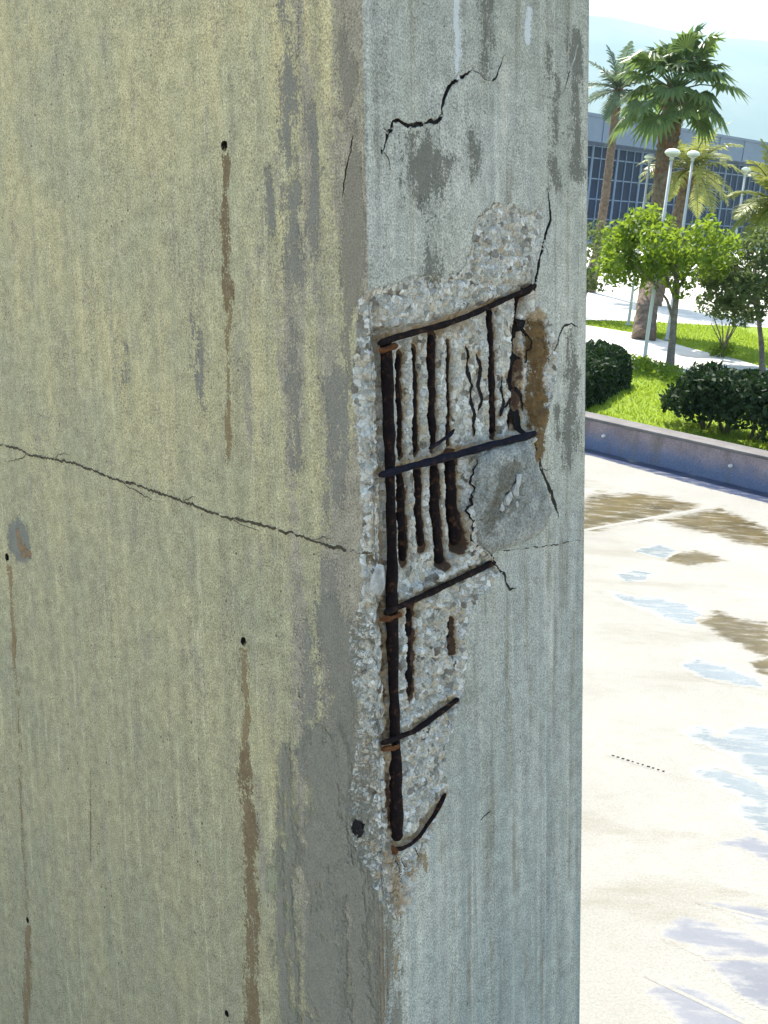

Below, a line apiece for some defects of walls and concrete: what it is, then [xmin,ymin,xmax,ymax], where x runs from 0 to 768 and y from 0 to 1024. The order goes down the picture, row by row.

crack [381,54,506,174]
crack [0,443,374,556]
rust [219,147,234,467]
spalling [265,15,559,1024]
crack [464,190,582,592]
rust [521,318,553,463]
rust [6,515,33,1024]
rust [238,642,261,1024]